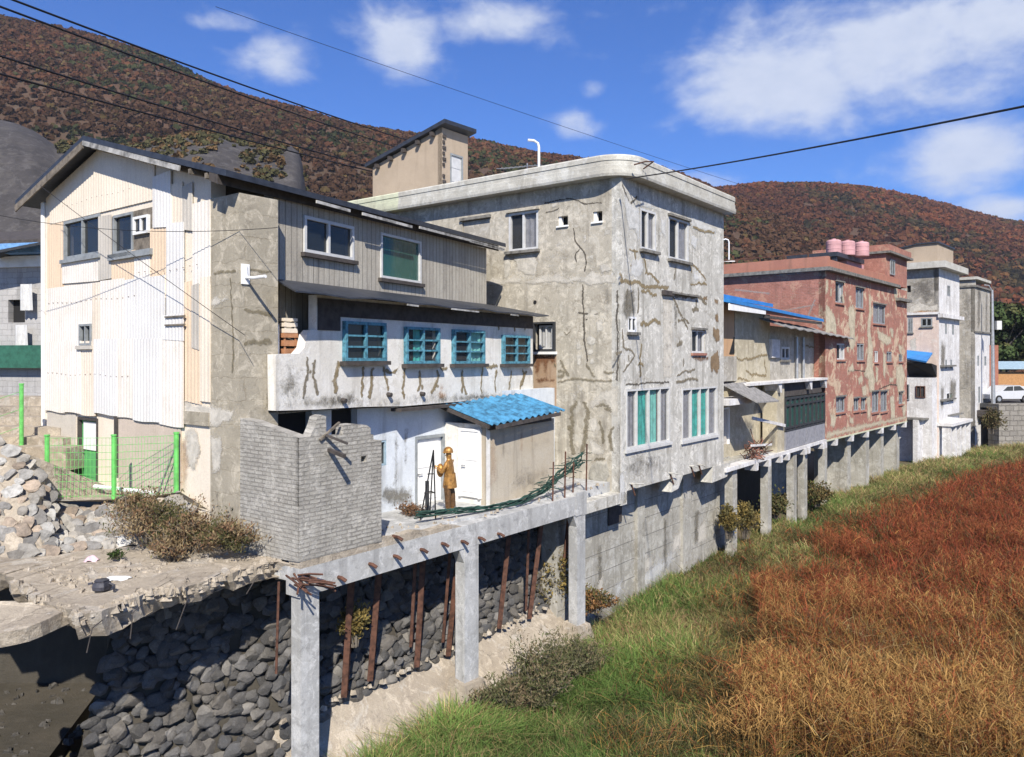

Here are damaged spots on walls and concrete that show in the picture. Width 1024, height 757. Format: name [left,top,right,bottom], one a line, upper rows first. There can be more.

crack [544,198,707,461]
spalling [703,296,720,374]
peeling [783,280,916,439]
peeling [910,303,938,313]